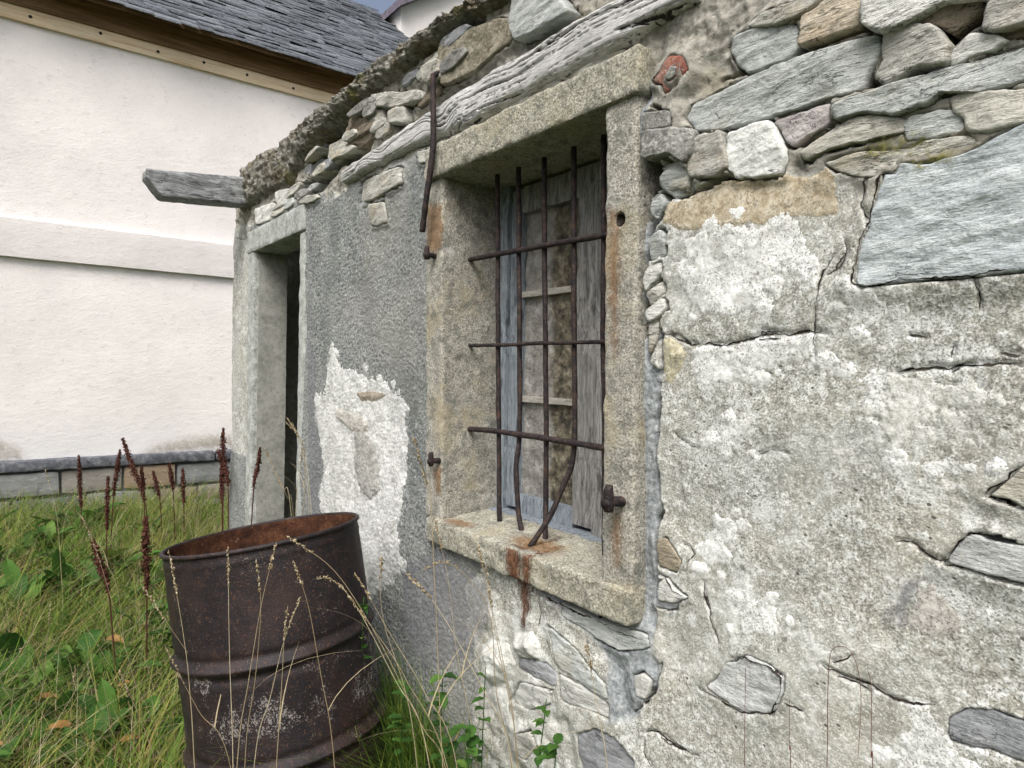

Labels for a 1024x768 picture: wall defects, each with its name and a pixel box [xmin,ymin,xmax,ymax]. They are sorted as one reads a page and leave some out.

rust [426,203,444,252]
crack [670,164,1013,355]
crack [900,346,1020,372]
peeling [312,342,410,601]
rust [506,535,573,628]